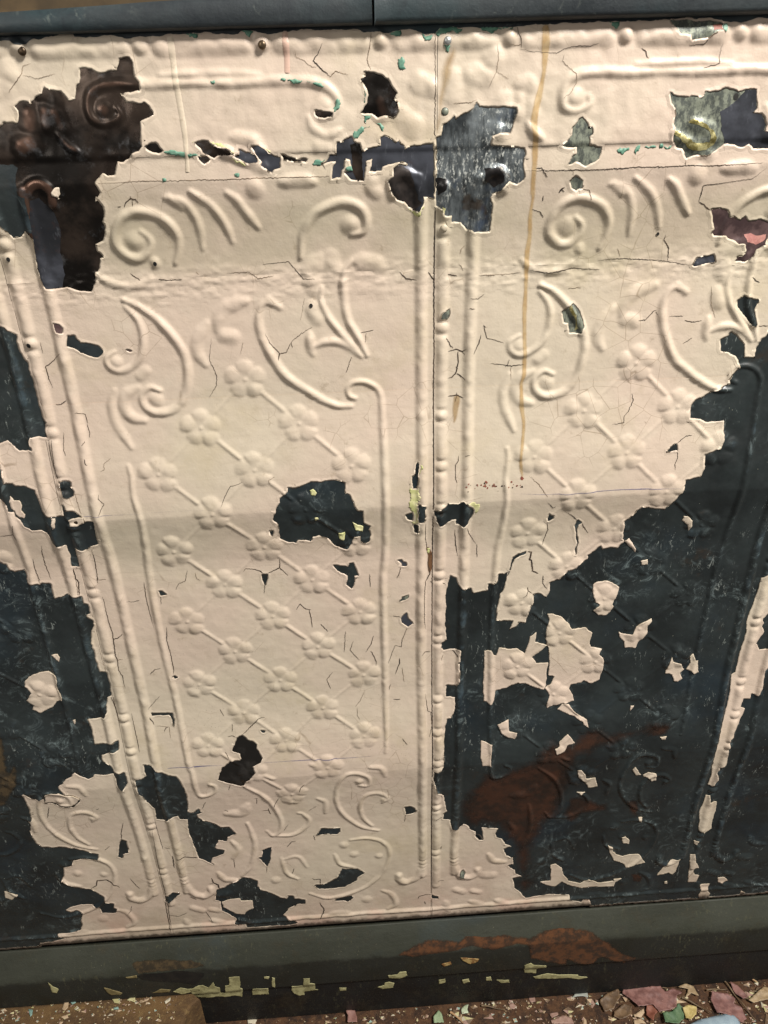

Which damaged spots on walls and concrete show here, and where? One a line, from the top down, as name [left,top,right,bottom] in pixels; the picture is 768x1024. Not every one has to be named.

peeling [0,53,167,296]
peeling [190,67,531,237]
peeling [666,82,768,163]
peeling [689,204,768,270]
peeling [0,323,50,455]
peeling [0,461,102,570]
peeling [266,476,375,591]
peeling [431,292,768,907]
peeling [0,559,238,950]
peeling [215,728,268,788]
rust [465,732,622,863]
rust [400,928,635,964]